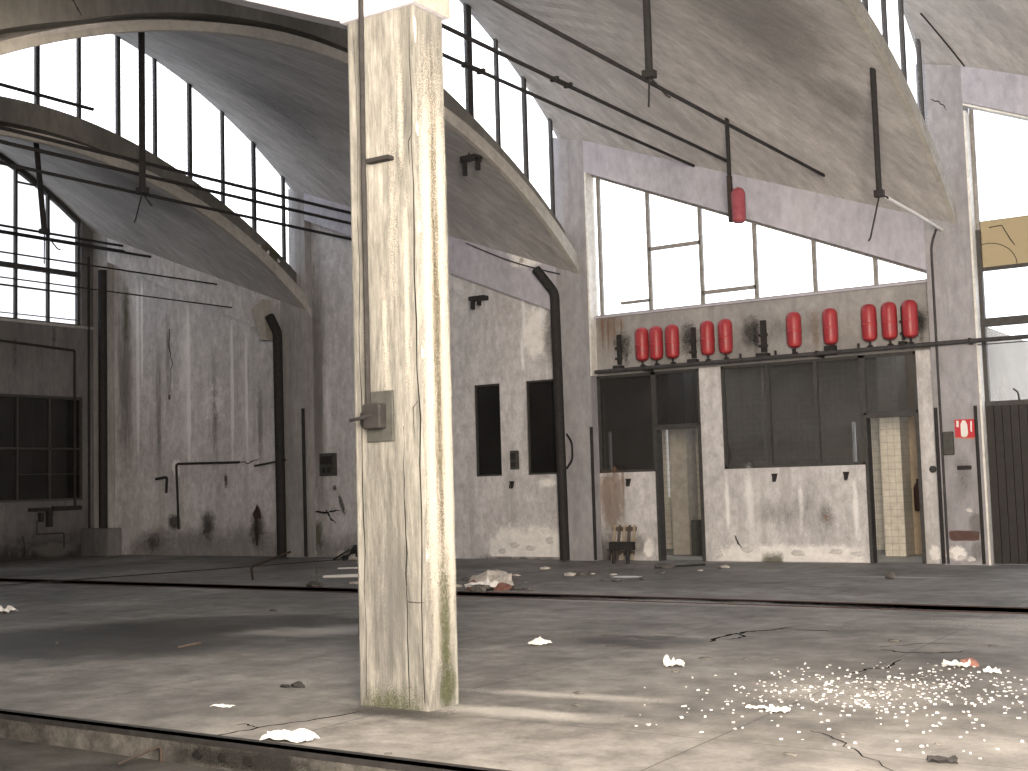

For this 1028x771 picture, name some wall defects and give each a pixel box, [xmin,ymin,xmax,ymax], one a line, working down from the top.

water stain [0,325,67,378]
water stain [117,276,193,474]
water stain [211,319,264,481]
water stain [311,257,357,557]
water stain [321,30,686,722]
water stain [124,510,277,556]
water stain [0,519,411,682]
crack [709,627,787,642]
crack [810,730,893,771]